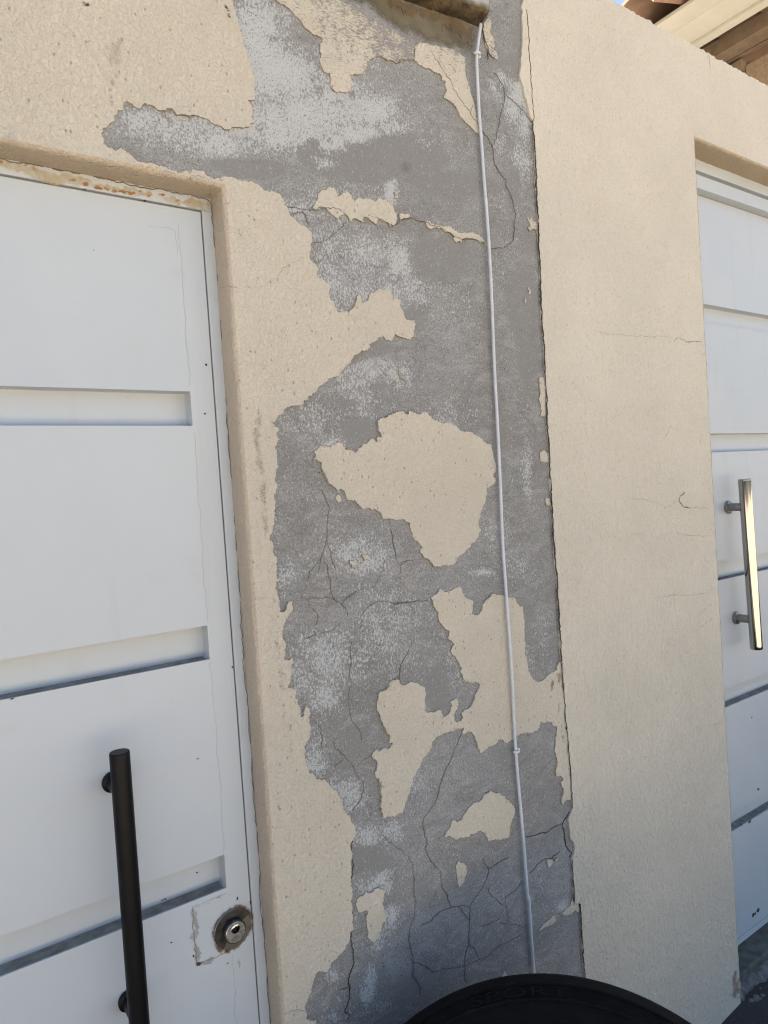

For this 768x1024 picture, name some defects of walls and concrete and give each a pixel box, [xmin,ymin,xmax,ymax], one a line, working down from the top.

corrosion [33,168,165,197]
peeling [101,0,584,1024]
crack [221,4,586,990]
corrosion [212,905,253,953]
crack [340,911,355,1019]